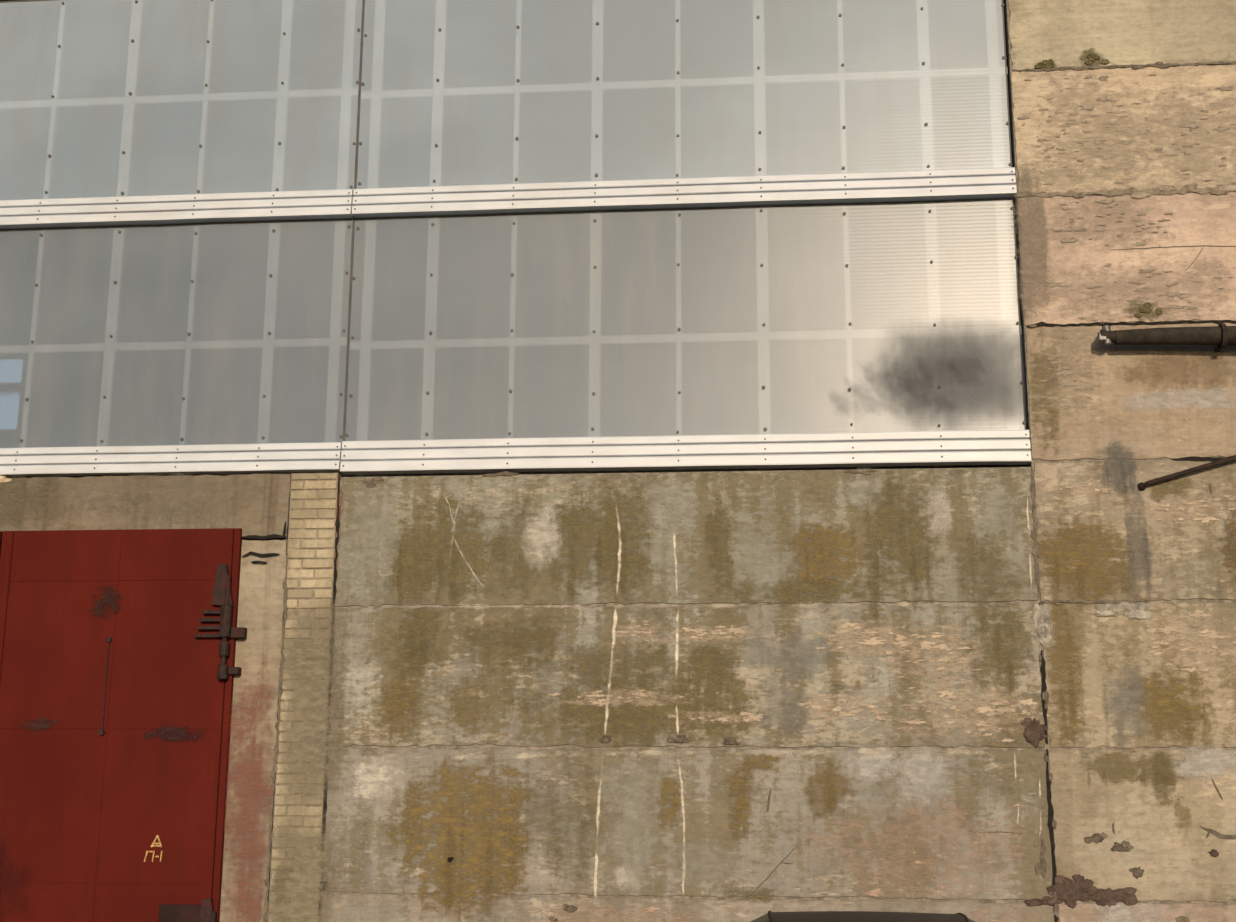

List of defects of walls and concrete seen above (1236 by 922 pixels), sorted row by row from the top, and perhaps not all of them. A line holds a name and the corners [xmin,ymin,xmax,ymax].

damp [847,471,881,508]
damp [526,507,557,558]
damp [650,482,696,592]
damp [604,608,618,734]
damp [353,758,403,799]
damp [848,748,944,804]
damp [596,765,648,886]
spalling [1084,832,1134,852]
spalling [1024,838,1144,922]